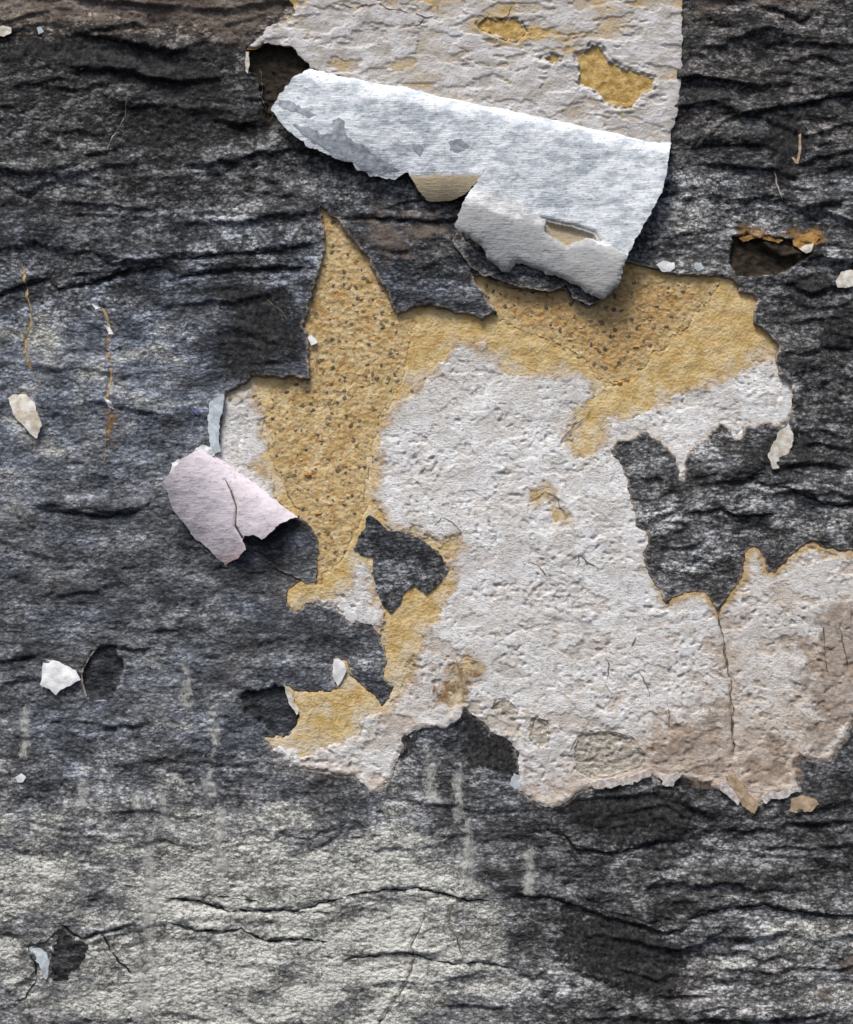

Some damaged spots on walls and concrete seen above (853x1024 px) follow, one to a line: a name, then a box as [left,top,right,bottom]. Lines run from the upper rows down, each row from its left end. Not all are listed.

peeling [165,0,853,814]
spalling [40,646,124,701]
crack [718,616,736,755]
crack [545,829,682,854]
spalling [30,929,88,981]
crack [9,923,134,1006]
crack [164,887,517,1024]
crack [514,895,853,935]